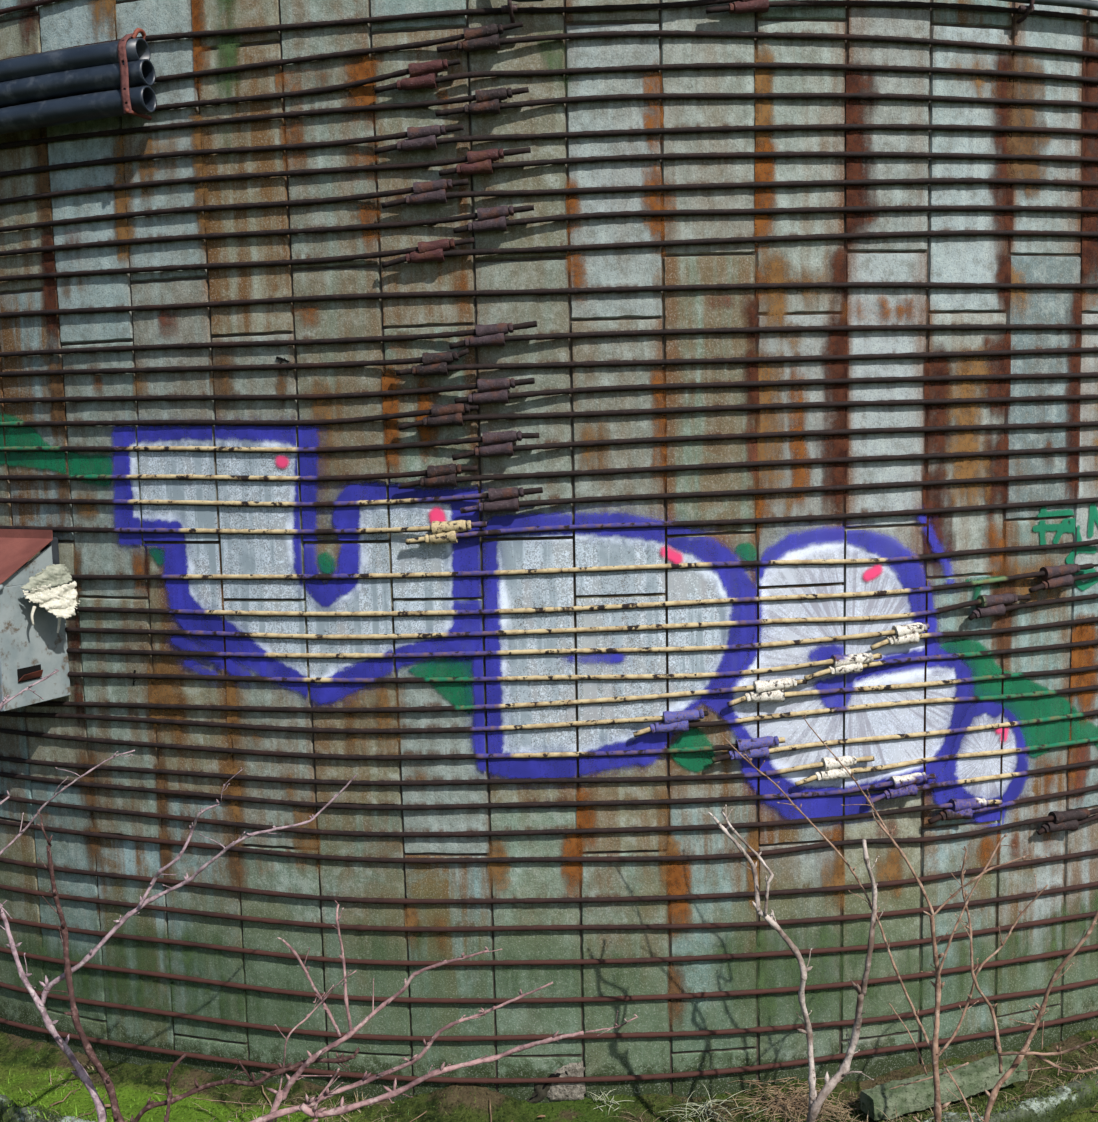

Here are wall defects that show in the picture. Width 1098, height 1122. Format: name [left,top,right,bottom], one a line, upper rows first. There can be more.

corrosion [192,0,206,87]
corrosion [346,54,377,115]
corrosion [35,134,82,341]
corrosion [745,48,879,536]
corrosion [879,298,912,319]
corrosion [1066,42,1098,498]
corrosion [147,660,182,738]
corrosion [155,760,171,885]
corrosion [224,757,245,888]
corrosion [562,785,595,895]
corrosion [659,836,692,935]
corrosion [667,964,684,1022]